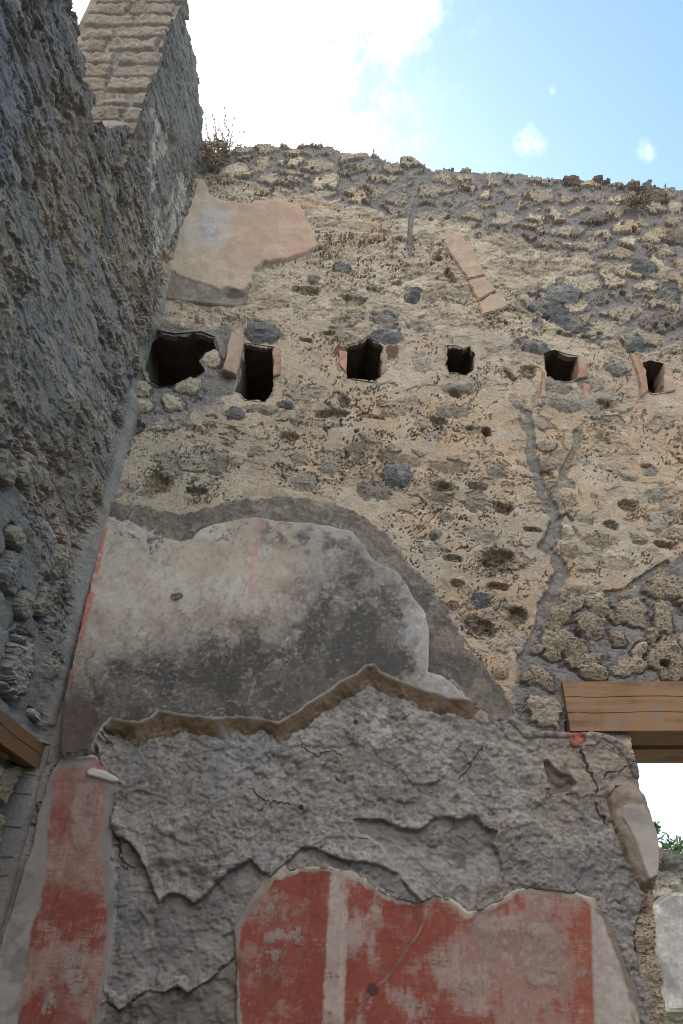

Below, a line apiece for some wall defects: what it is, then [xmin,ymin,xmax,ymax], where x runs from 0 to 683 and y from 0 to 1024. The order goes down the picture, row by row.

spalling [480,546,521,573]
spalling [459,615,493,637]
spalling [502,602,530,626]
crack [249,788,297,812]
crack [454,743,484,780]
flaking render [543,754,580,794]
crack [579,744,634,827]
flaking render [287,806,502,909]
flaking render [104,813,305,1024]
crack [349,910,432,1024]